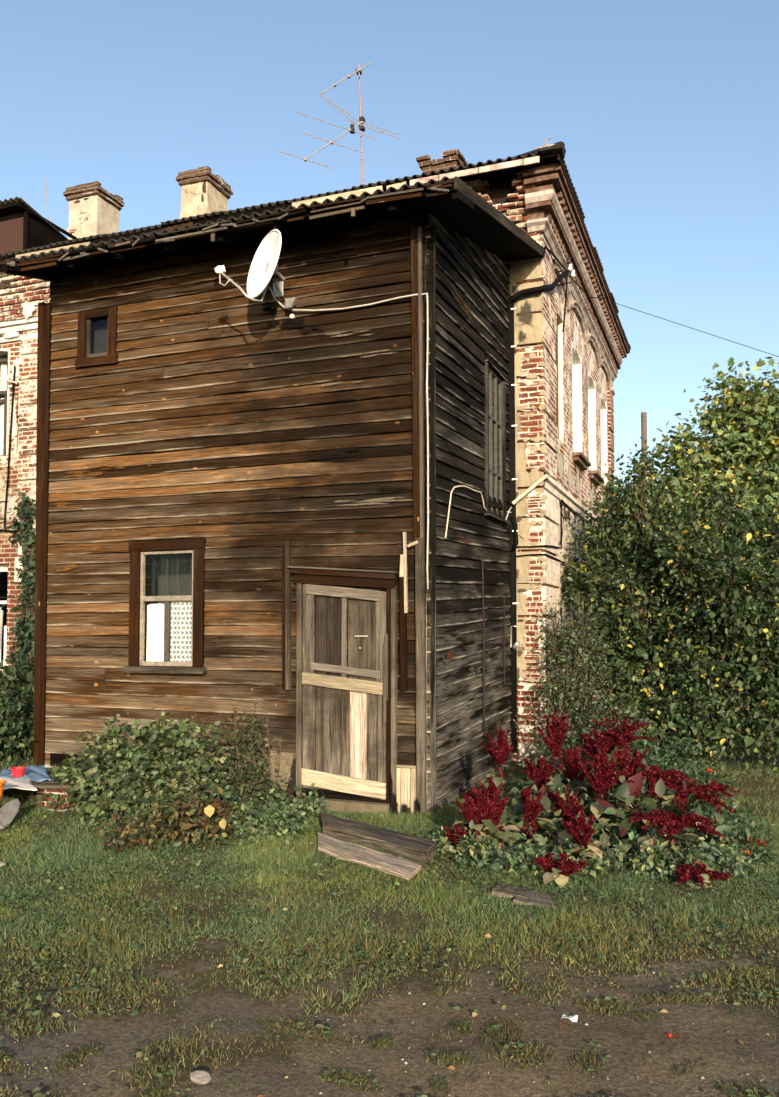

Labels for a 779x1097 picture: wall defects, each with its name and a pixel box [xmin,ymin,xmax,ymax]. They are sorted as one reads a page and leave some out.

spalling [499,178,523,213]
peeling [22,302,35,319]
water stain [262,301,370,337]
peeling [6,357,20,437]
flaking render [517,353,596,504]
flaking render [0,474,18,529]
flaking render [517,493,548,744]